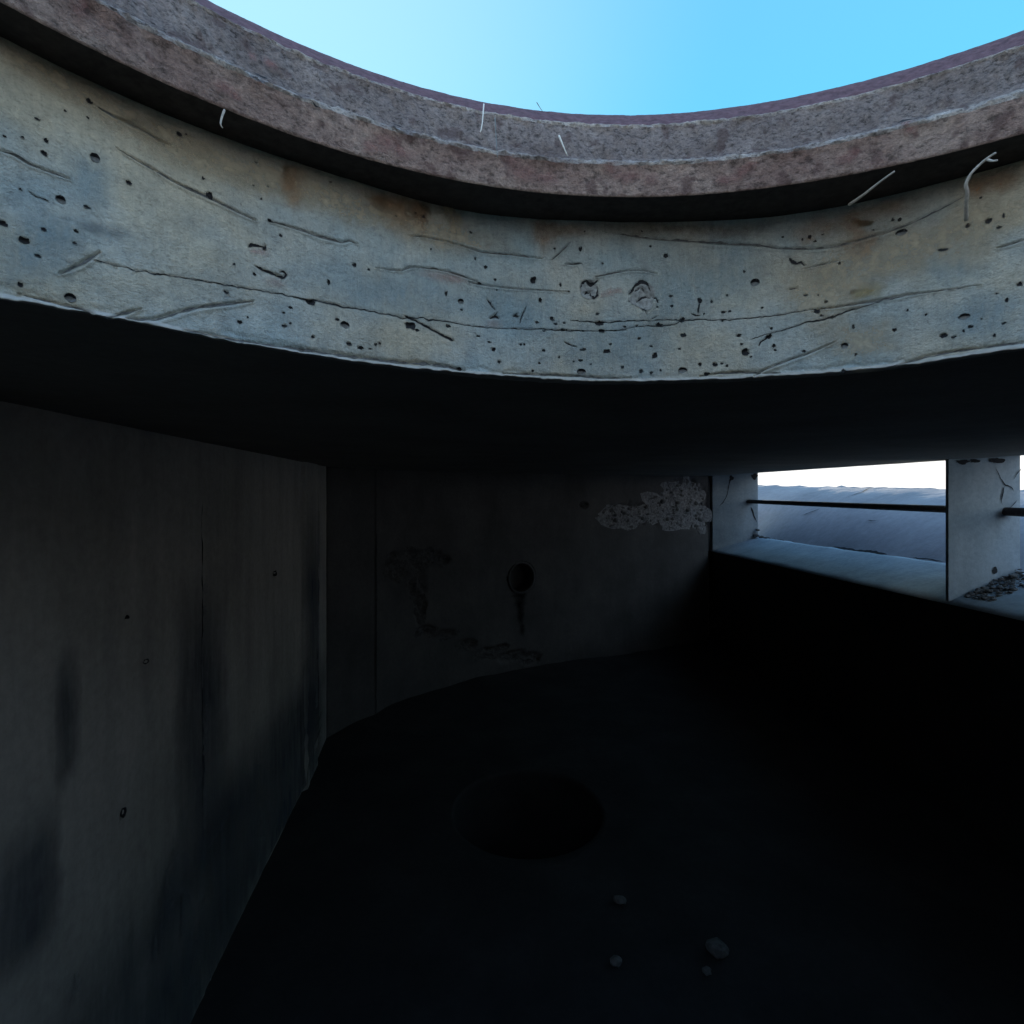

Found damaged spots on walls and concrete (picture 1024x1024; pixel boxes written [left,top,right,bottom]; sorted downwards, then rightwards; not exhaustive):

crack [97,260,900,339]
spalling [559,279,599,299]
spalling [629,280,673,312]
spalling [595,476,712,534]
crack [996,469,1021,507]